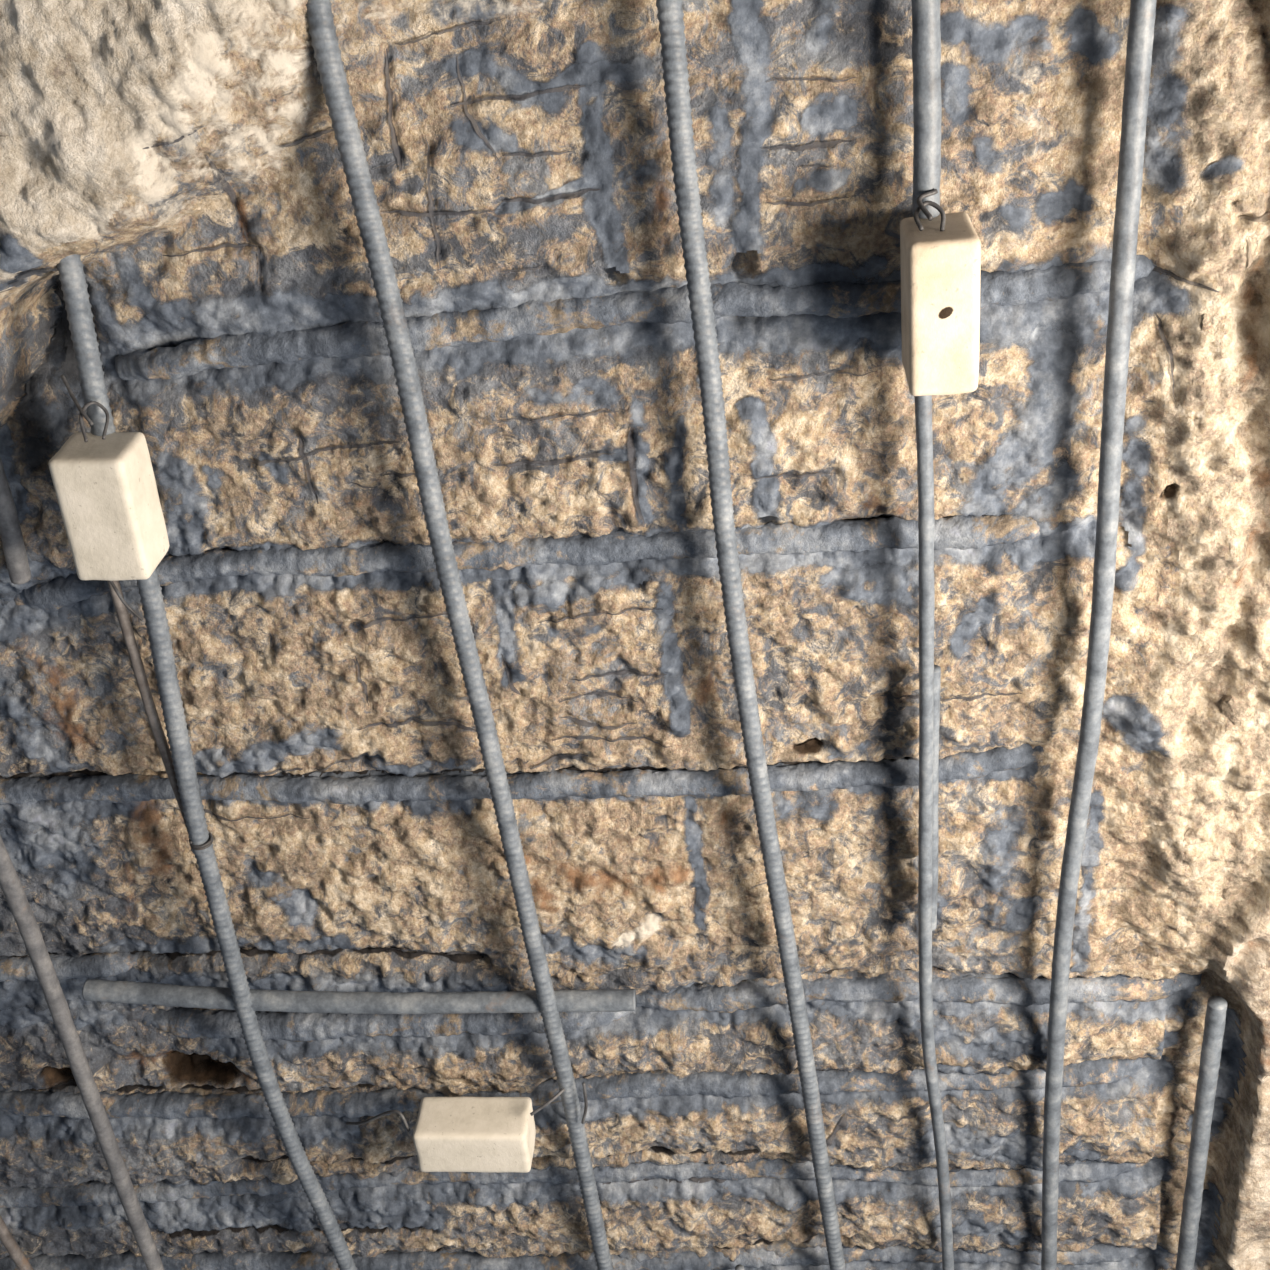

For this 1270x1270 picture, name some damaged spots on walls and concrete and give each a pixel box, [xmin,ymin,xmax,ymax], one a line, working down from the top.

spalling [0,0,829,1270]
spalling [656,0,1270,1270]